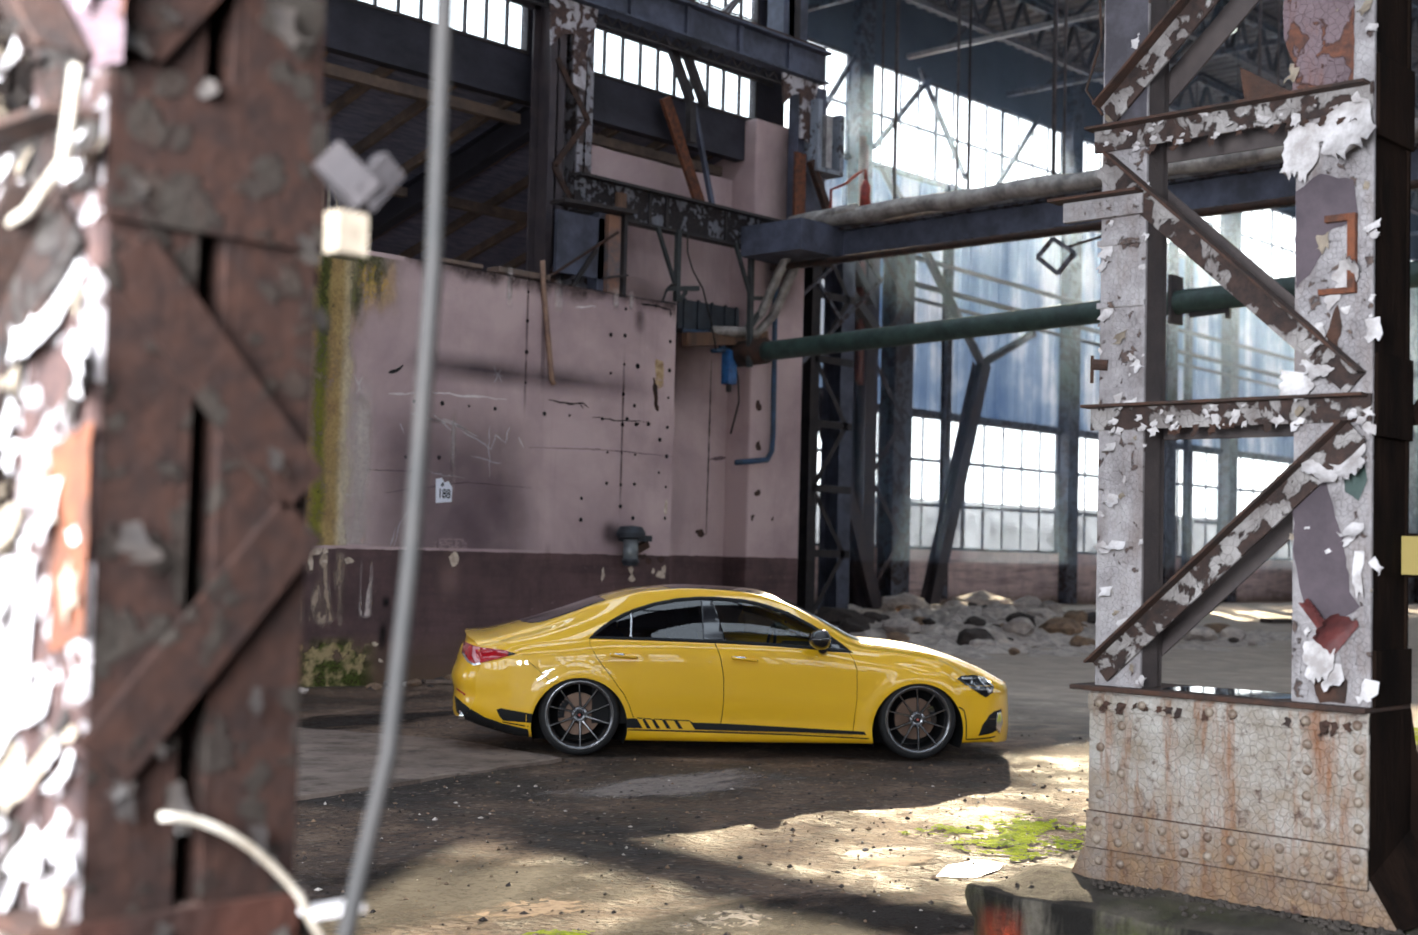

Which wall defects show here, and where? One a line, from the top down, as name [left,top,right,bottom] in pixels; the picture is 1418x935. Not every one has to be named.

peeling [0,18,50,113]
peeling [196,79,220,99]
peeling [1105,0,1149,86]
corrosion [1283,0,1355,90]
peeling [1211,91,1383,432]
peeling [0,256,90,476]
leakage [307,253,391,623]
peeling [1098,330,1179,453]
peeling [1201,403,1247,429]
peeling [1288,406,1383,704]
peeling [0,464,79,925]
leakage [301,641,369,687]